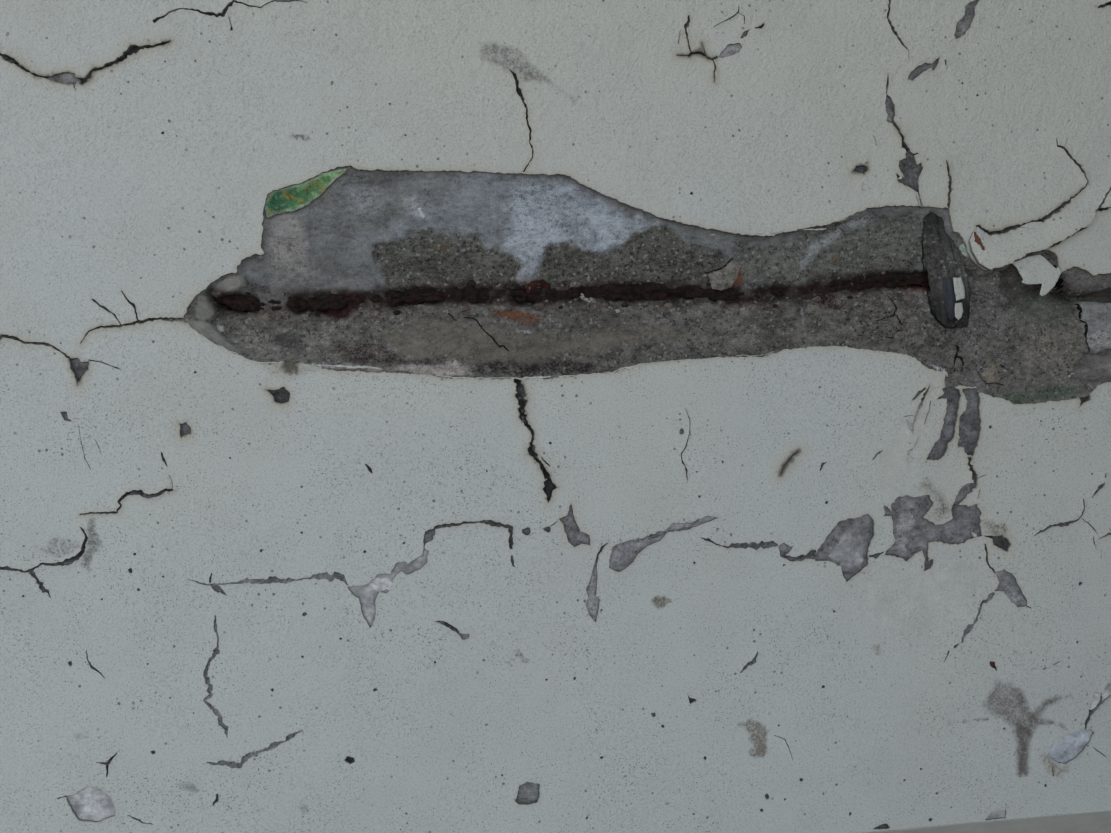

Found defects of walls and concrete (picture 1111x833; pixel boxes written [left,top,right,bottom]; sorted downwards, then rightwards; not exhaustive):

crack [0,17,166,85]
crack [193,2,247,30]
crack [684,17,742,71]
crack [511,72,533,172]
crack [89,294,186,332]
crack [514,379,556,501]
spalling [180,166,1111,647]
crack [0,488,173,592]
crack [1039,519,1111,534]
crack [192,571,348,768]
leakage [987,688,1056,774]